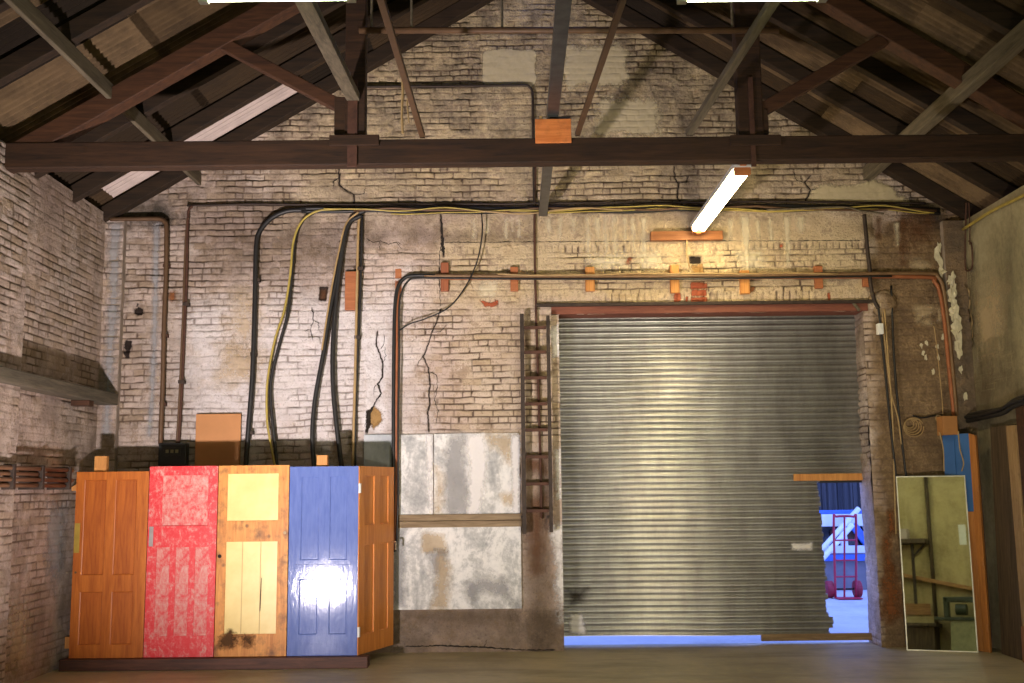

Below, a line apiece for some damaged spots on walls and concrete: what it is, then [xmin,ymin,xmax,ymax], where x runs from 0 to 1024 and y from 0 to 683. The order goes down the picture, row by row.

crack [722,237,861,245]
crack [418,214,648,431]
peeling [903,242,973,375]
spalling [365,406,382,432]
crack [364,331,386,433]